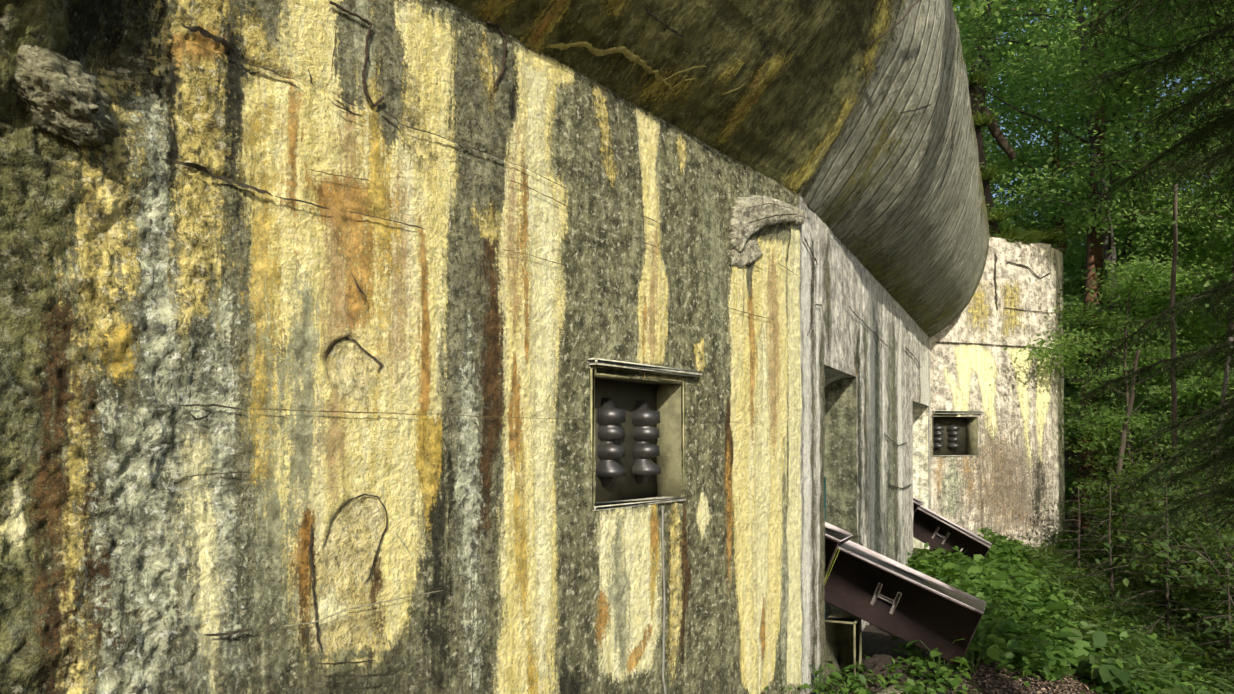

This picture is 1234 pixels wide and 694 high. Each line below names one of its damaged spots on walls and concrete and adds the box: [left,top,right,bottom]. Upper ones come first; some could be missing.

rust [13,298,142,694]
rust [290,509,348,674]
damp [42,0,707,694]
rust [365,548,387,668]
crack [161,23,1052,423]
damp [596,0,1054,694]